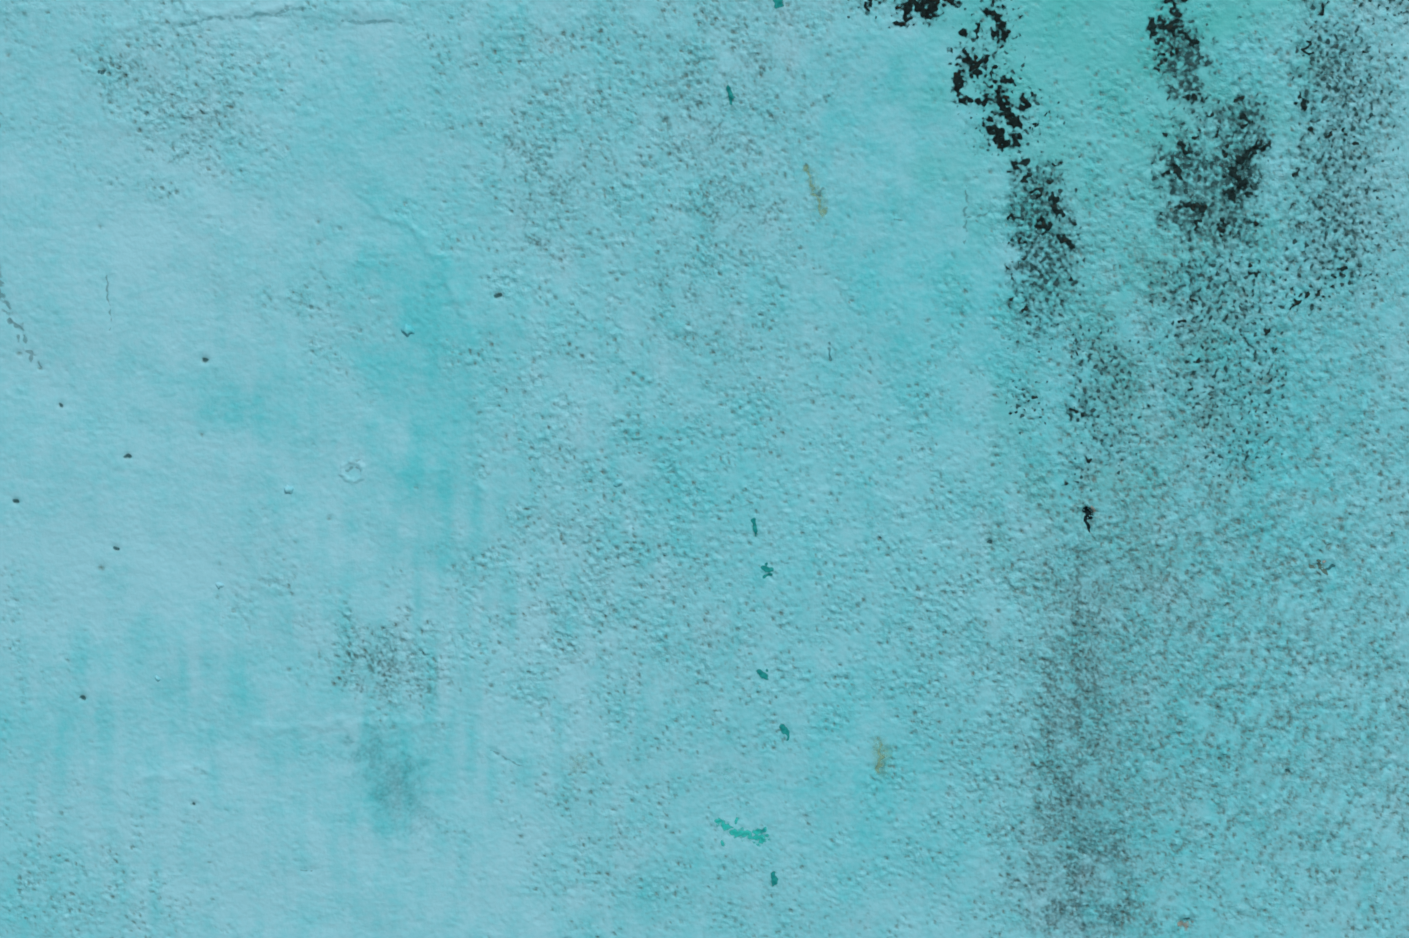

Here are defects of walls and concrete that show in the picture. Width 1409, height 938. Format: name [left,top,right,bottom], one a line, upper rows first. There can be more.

leakage [847,0,1149,491]
leakage [1147,0,1409,485]